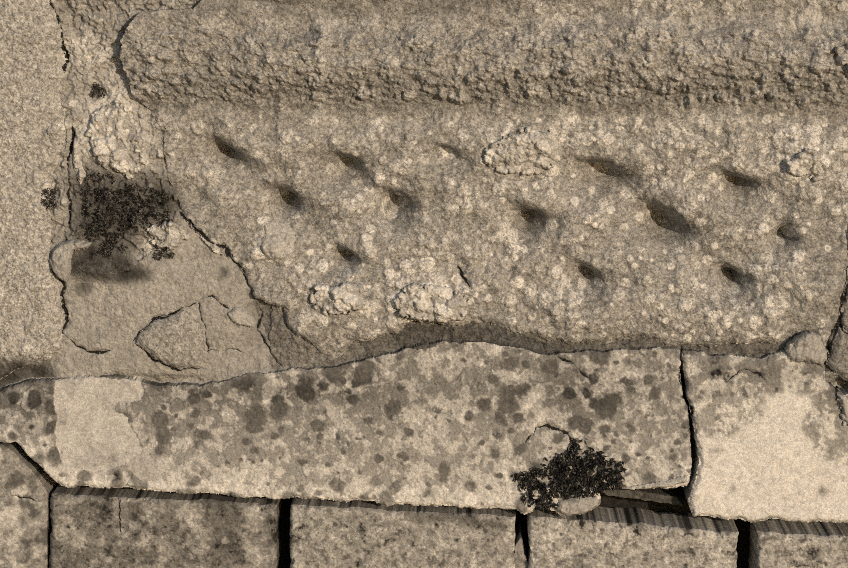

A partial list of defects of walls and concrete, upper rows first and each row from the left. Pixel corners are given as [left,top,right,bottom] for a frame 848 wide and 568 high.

crack [52,271,110,354]
crack [133,295,242,371]
crack [178,211,283,367]
crack [826,277,848,361]
crack [678,346,694,443]